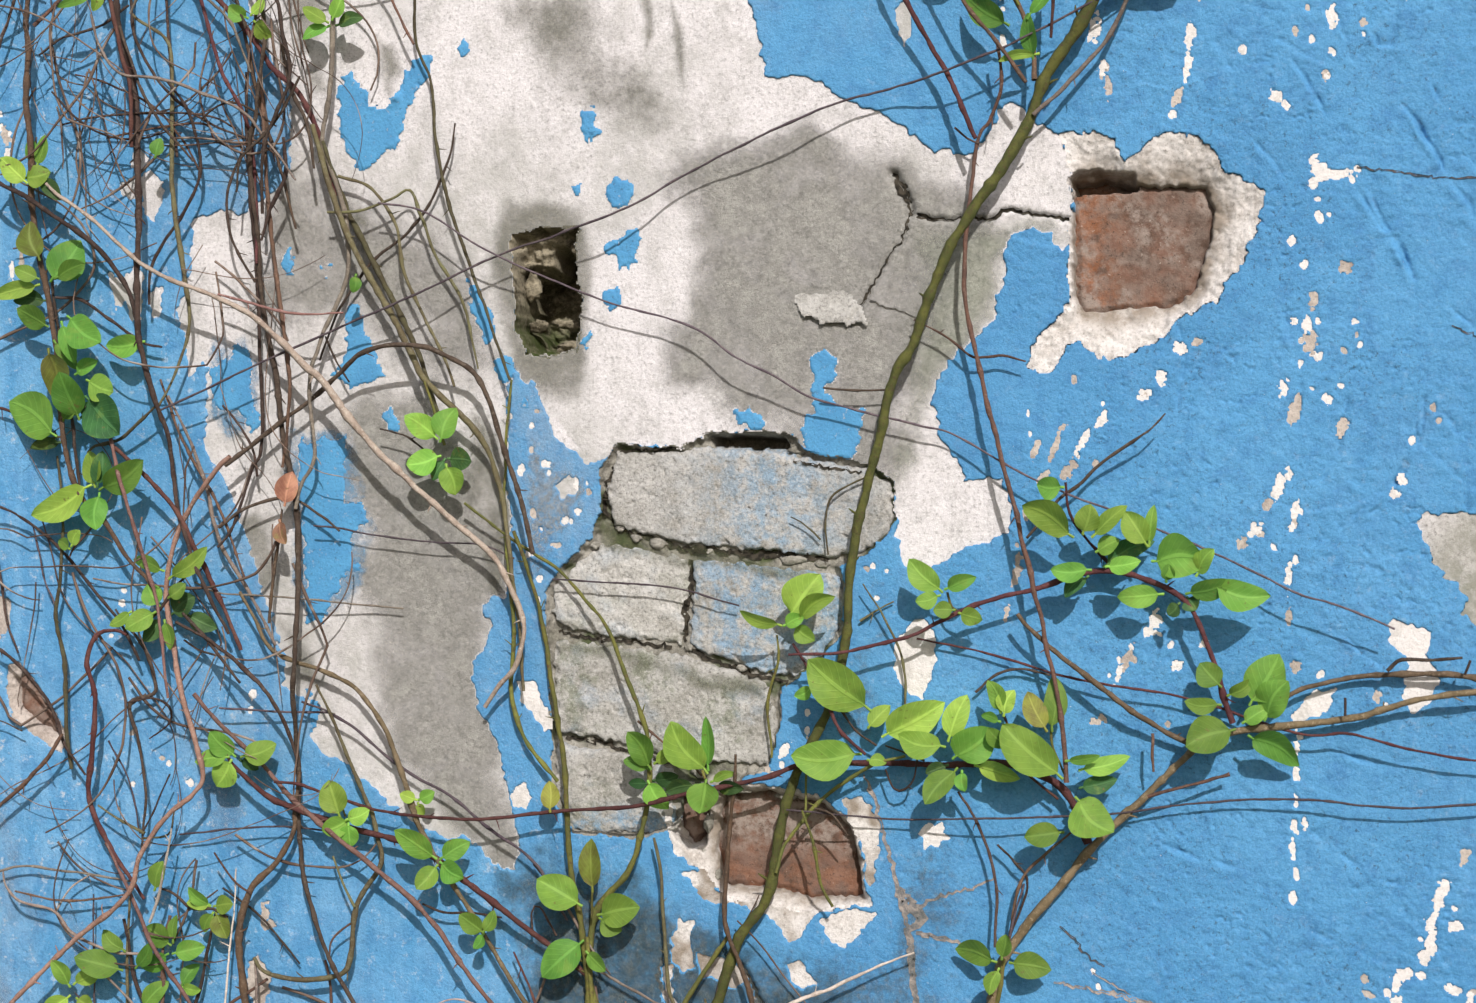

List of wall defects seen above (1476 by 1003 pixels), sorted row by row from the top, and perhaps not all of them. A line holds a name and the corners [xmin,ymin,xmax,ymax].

spalling [1292,3,1339,83]
spalling [1268,88,1291,111]
crack [1357,166,1476,179]
crack [860,173,1069,319]
peeling [108,0,1265,948]
peeling [1417,511,1476,625]
peeling [0,596,11,639]
spalling [6,661,65,753]
peeling [247,955,272,1003]
peeling [662,918,749,1003]
peeling [787,960,817,988]